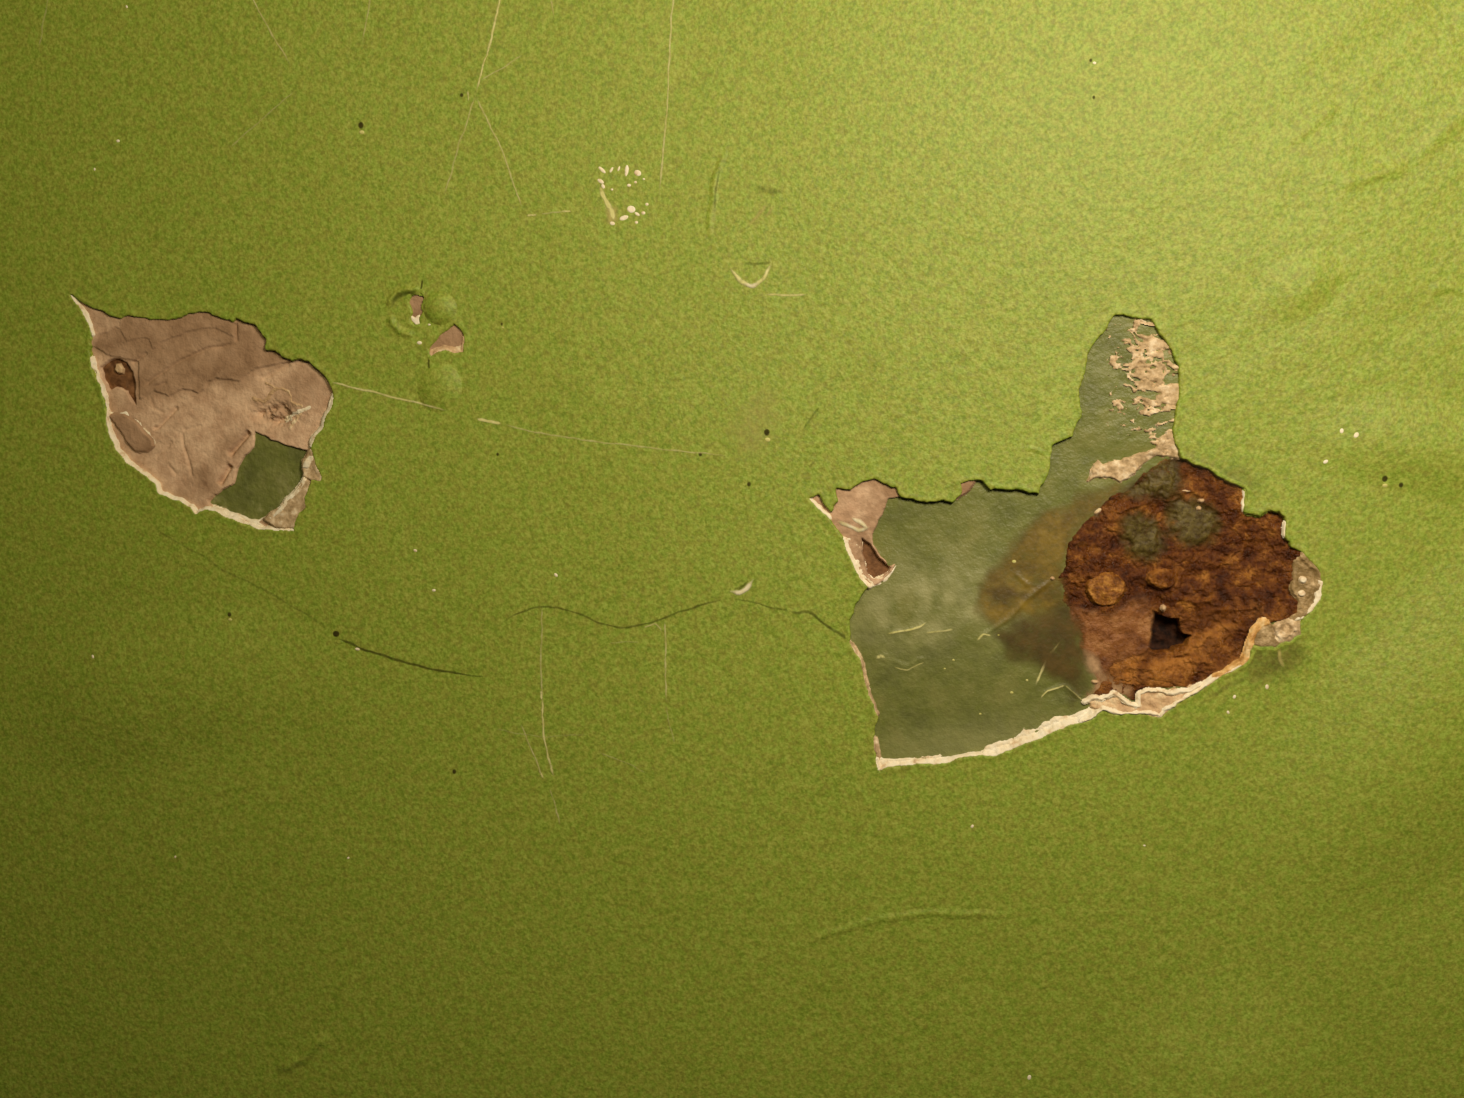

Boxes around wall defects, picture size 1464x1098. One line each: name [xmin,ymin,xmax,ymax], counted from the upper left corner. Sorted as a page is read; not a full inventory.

peeling [71,295,334,531]
peeling [385,281,464,368]
crack [333,631,456,673]
peeling [810,315,1323,771]